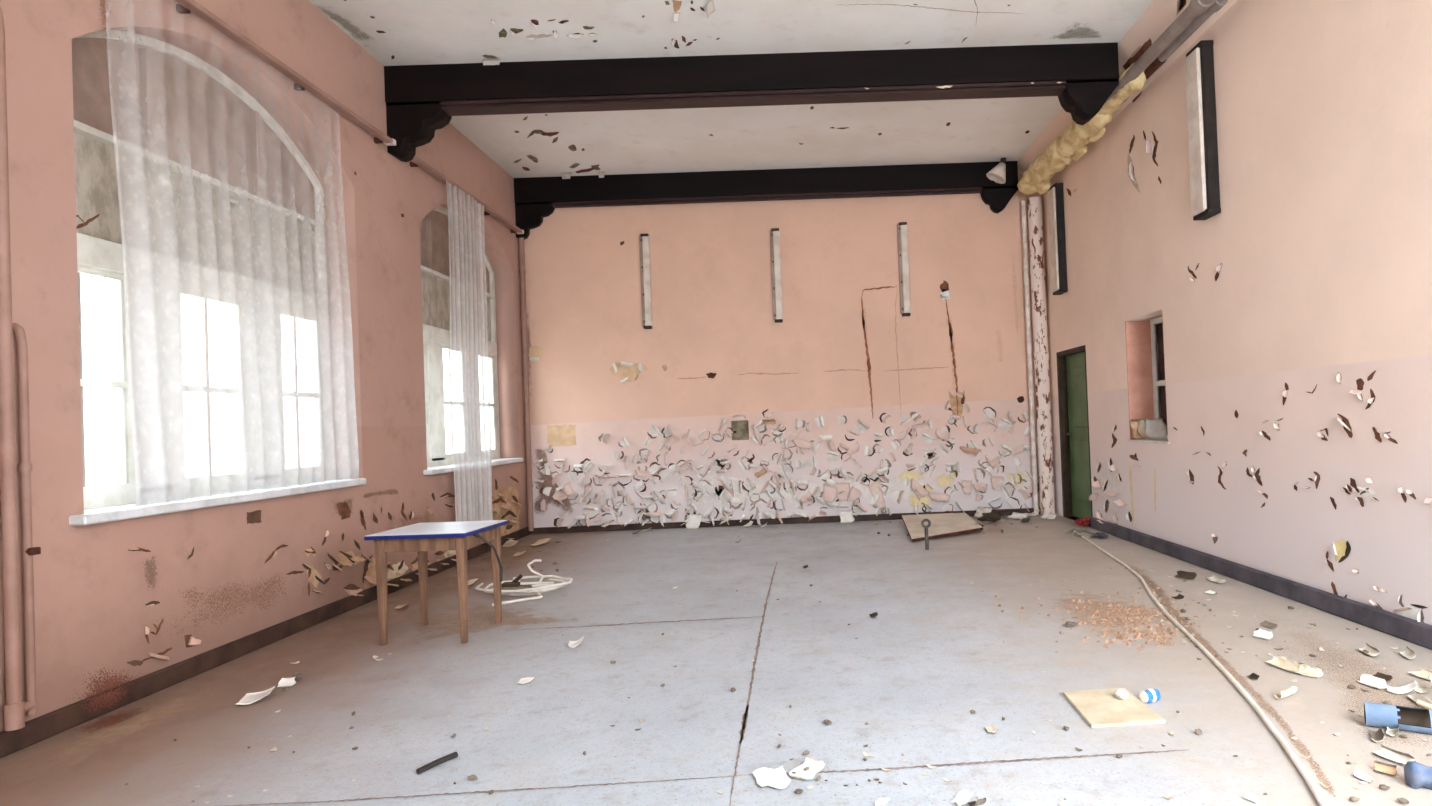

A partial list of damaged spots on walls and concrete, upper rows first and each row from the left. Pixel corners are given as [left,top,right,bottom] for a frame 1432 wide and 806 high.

peeling [491,19,597,42]
peeling [514,114,605,179]
peeling [1336,370,1376,409]
peeling [1317,414,1353,441]
peeling [1372,427,1398,444]
peeling [483,390,1057,544]
peeling [1089,418,1177,535]
peeling [1243,449,1268,508]
peeling [1294,471,1379,510]
spalling [286,492,456,596]
peeling [1325,539,1359,598]
peeling [1369,585,1428,623]